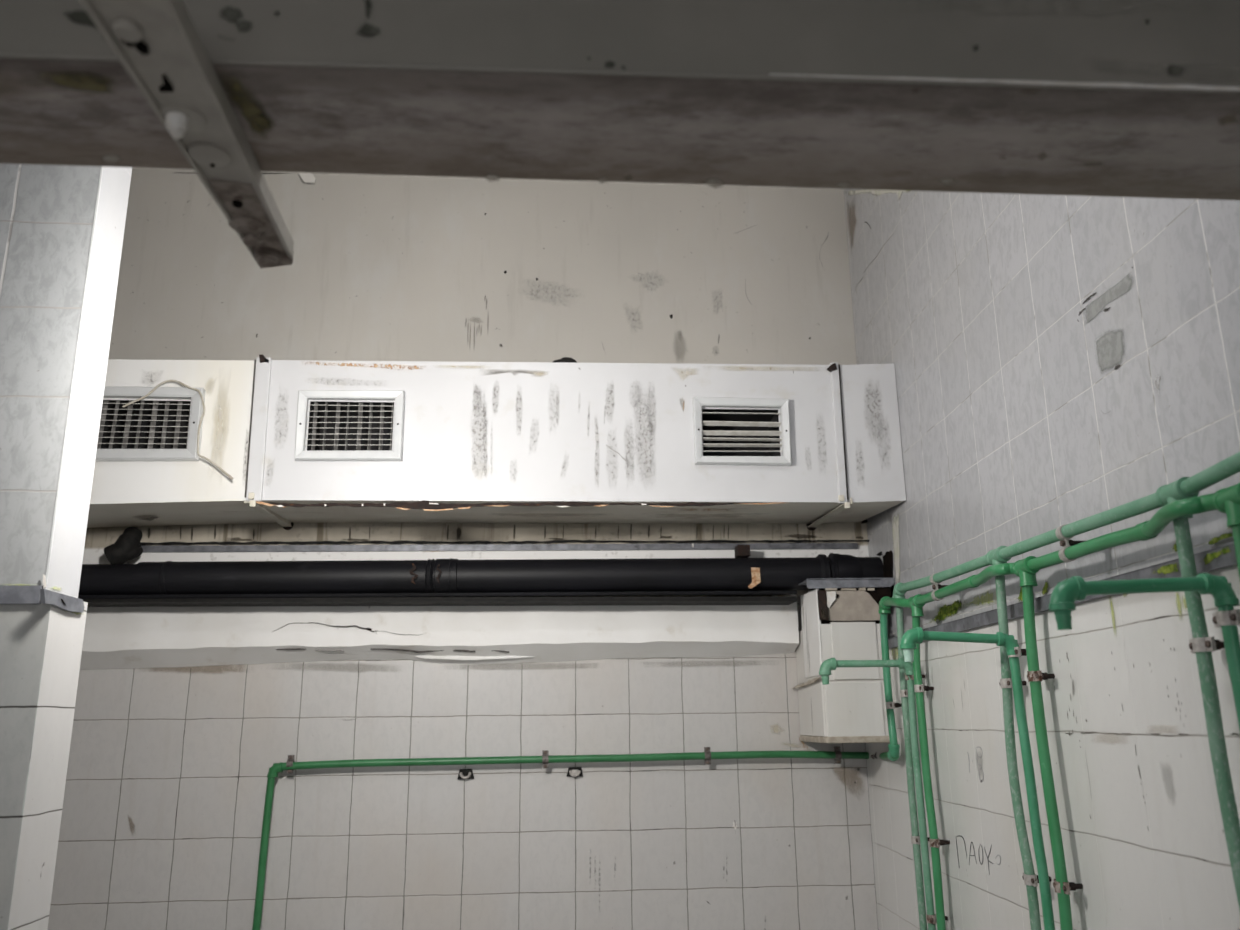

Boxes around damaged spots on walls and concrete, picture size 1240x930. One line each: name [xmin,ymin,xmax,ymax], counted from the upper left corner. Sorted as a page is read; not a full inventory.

mould [224,80,271,134]
flaking render [848,189,917,202]
crack [275,622,509,653]
leakage [252,452,1240,930]